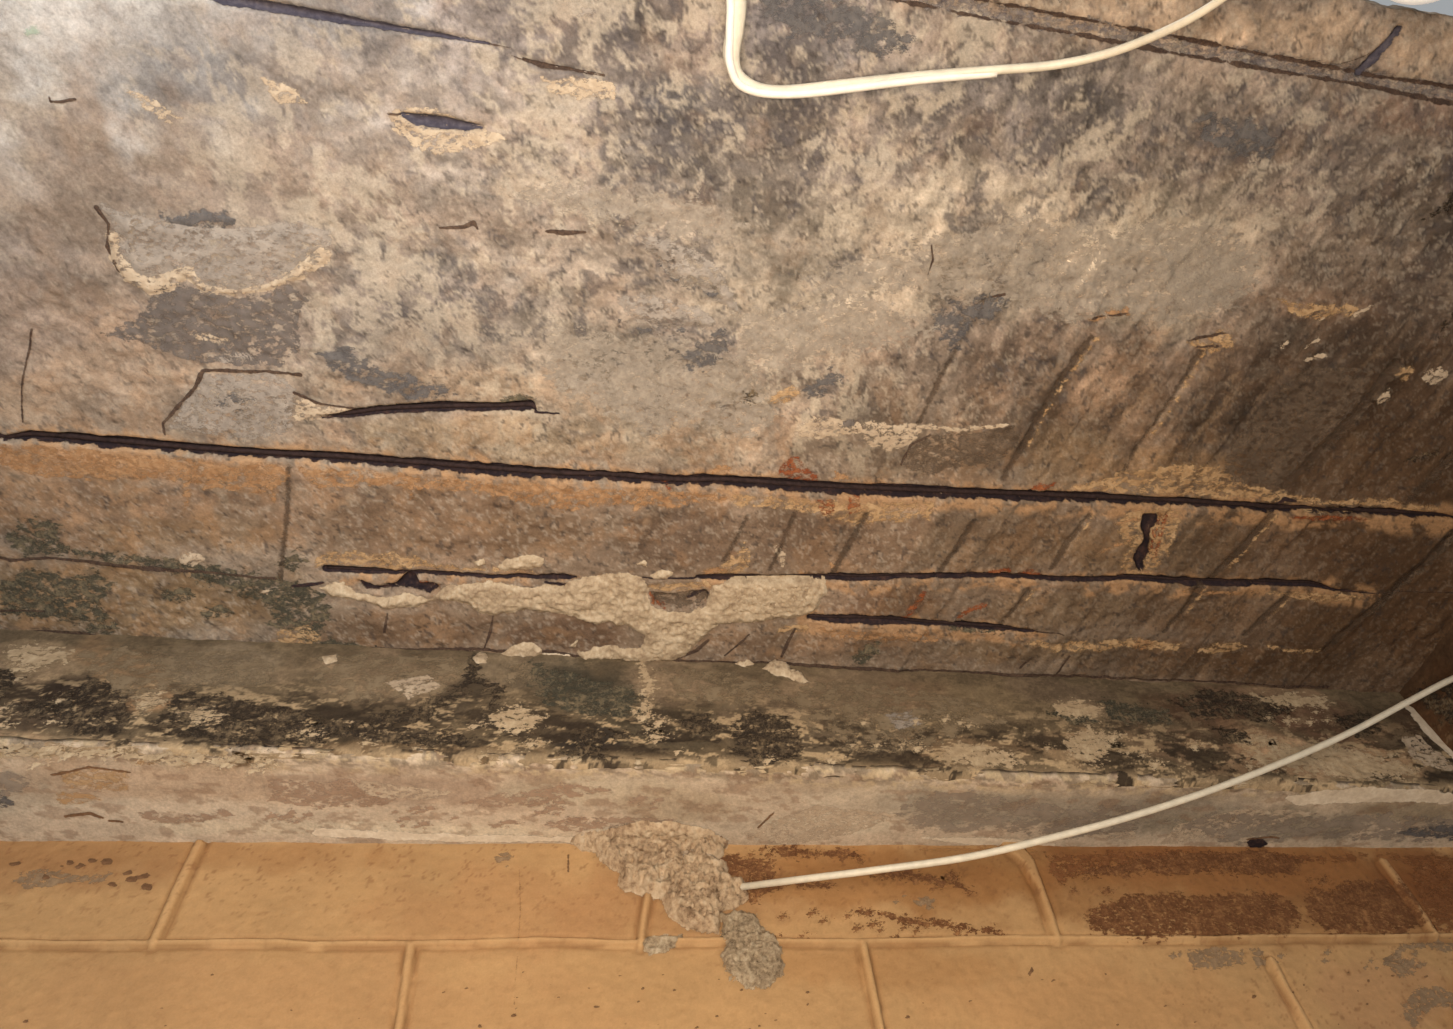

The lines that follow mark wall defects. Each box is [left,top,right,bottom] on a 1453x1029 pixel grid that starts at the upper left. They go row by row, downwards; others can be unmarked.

crack [214,0,605,76]
crack [0,328,1453,519]
spalling [358,571,438,593]
rust [315,550,533,572]
hole [649,580,711,609]
crack [642,572,1453,688]
rust [1022,628,1247,654]
hole [1133,513,1162,571]
rust [1031,462,1439,574]
mould [0,669,136,744]
mould [153,653,507,750]
mould [679,710,803,769]